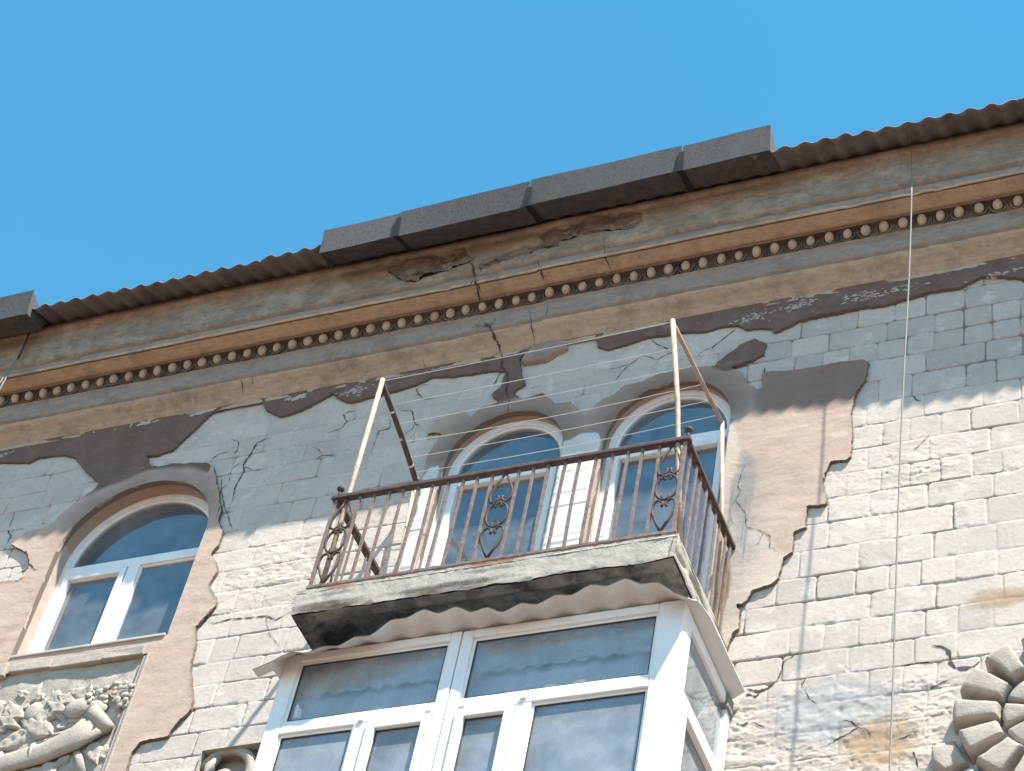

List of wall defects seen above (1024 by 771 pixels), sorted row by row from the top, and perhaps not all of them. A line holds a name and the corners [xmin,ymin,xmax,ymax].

crack [462,247,510,418]
peeling [0,451,99,582]
crack [212,438,268,527]
crack [729,464,782,554]
peeling [515,267,1024,771]
damp [297,598,361,611]
damp [389,577,495,595]
crack [901,644,980,689]